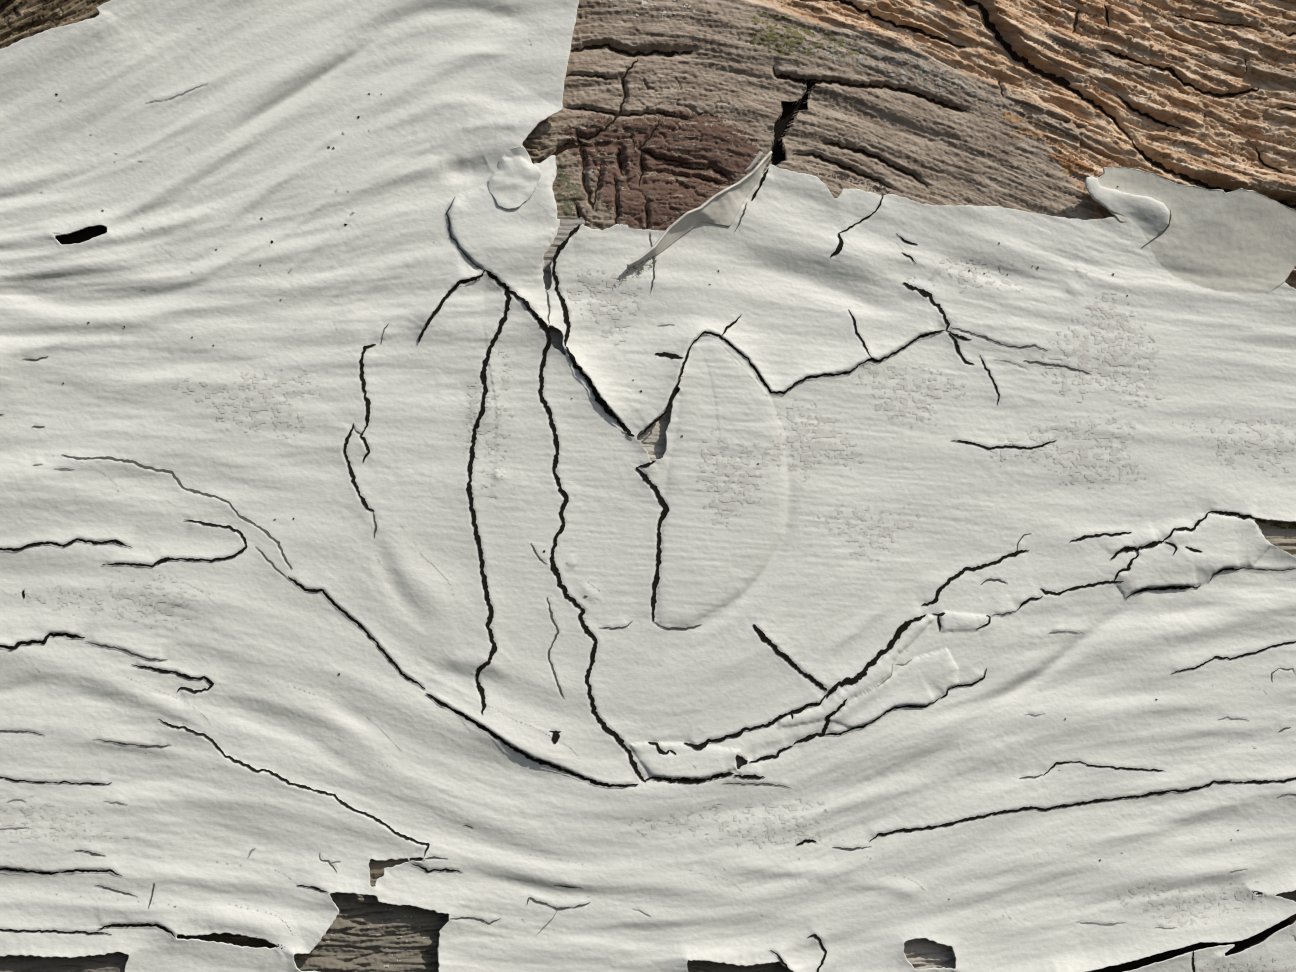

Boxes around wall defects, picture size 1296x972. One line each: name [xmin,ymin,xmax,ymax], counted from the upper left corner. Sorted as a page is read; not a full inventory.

peeling [487,146,542,209]
peeling [529,155,585,290]
crack [0,43,1296,789]
crack [0,777,128,830]
crack [93,719,462,873]
crack [796,761,1296,850]
crack [0,850,176,938]
peeling [177,933,279,948]
crack [296,858,341,893]
peeling [294,892,449,972]
peeling [904,938,955,970]
peeling [1124,920,1296,972]